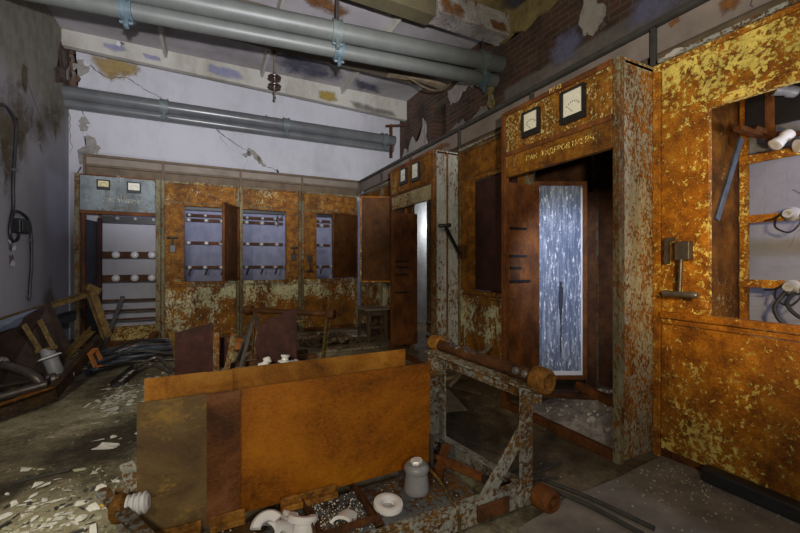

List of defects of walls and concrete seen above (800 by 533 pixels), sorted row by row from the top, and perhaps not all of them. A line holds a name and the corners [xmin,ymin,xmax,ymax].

peeling [578,0,607,36]
rust [720,0,738,11]
flaking render [54,42,90,87]
leakage [93,44,137,77]
crack [90,65,162,98]
peeling [447,81,475,105]
leakage [0,84,61,177]
peeling [76,114,101,164]
flaking render [242,146,267,167]
peeling [402,118,428,157]